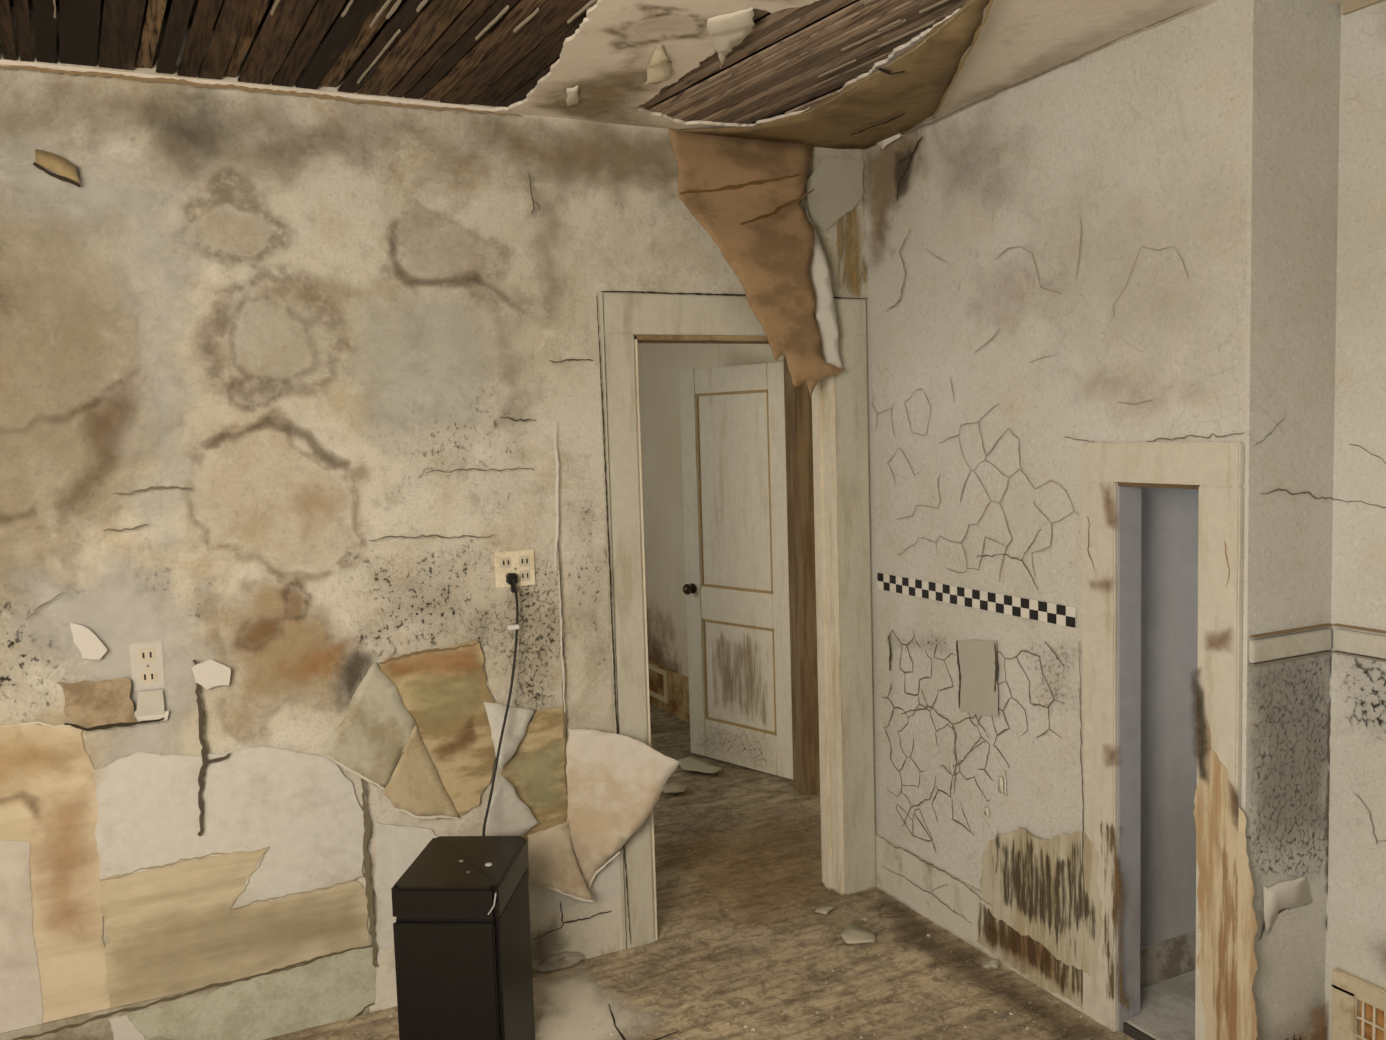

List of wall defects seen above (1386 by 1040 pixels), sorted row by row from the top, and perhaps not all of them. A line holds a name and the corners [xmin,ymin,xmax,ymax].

spalling [638,0,967,124]
peeling [876,133,904,149]
crack [871,379,1095,589]
crack [1261,488,1386,508]
water stain [0,603,64,686]
flaking render [0,568,376,1040]
crack [192,659,230,836]
flaking render [320,640,680,902]
water stain [648,641,678,673]
crack [881,630,1084,923]
water stain [1249,663,1327,874]
water stain [1351,659,1386,732]